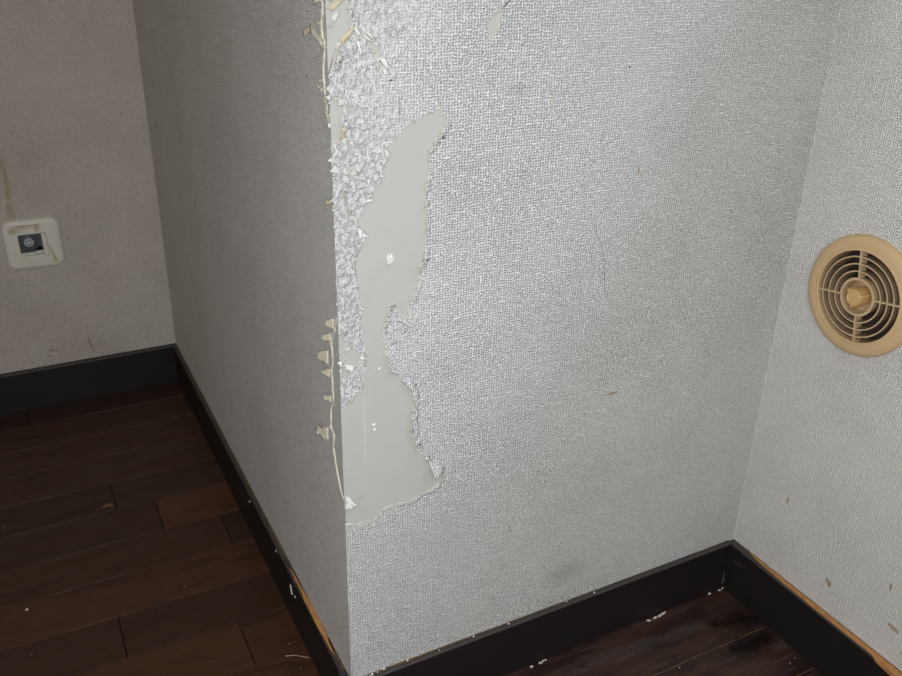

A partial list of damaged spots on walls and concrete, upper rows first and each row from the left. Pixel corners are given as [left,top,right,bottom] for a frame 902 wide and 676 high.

spalling [342,0,398,83]
peeling [317,315,365,399]